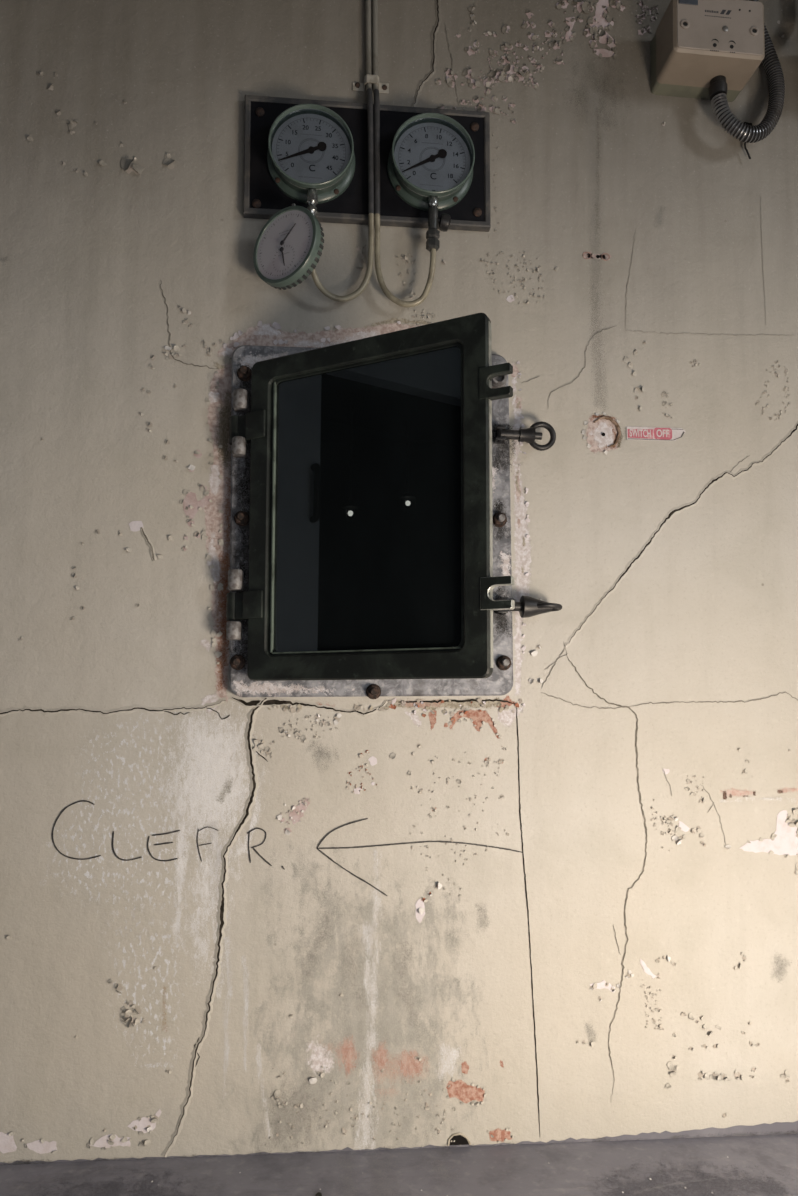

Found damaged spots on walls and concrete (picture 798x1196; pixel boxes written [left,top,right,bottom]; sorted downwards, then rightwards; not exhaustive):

crack [411,0,459,107]
peeling [435,0,626,124]
spalling [162,254,436,714]
spalling [253,358,543,871]
crack [0,421,798,1157]
peeling [651,799,706,852]
peeling [685,775,798,875]
damp [2,699,497,1196]
peeling [415,874,463,923]
peeling [0,1131,58,1154]
peeling [87,1109,162,1150]